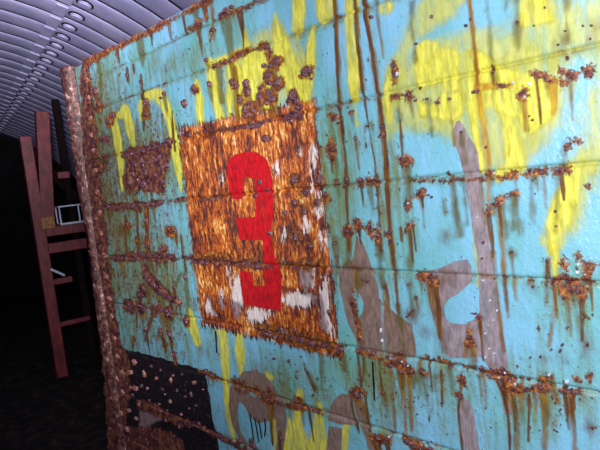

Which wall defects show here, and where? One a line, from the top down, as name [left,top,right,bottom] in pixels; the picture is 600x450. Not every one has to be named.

rust [79,0,441,450]
rust [348,0,600,450]